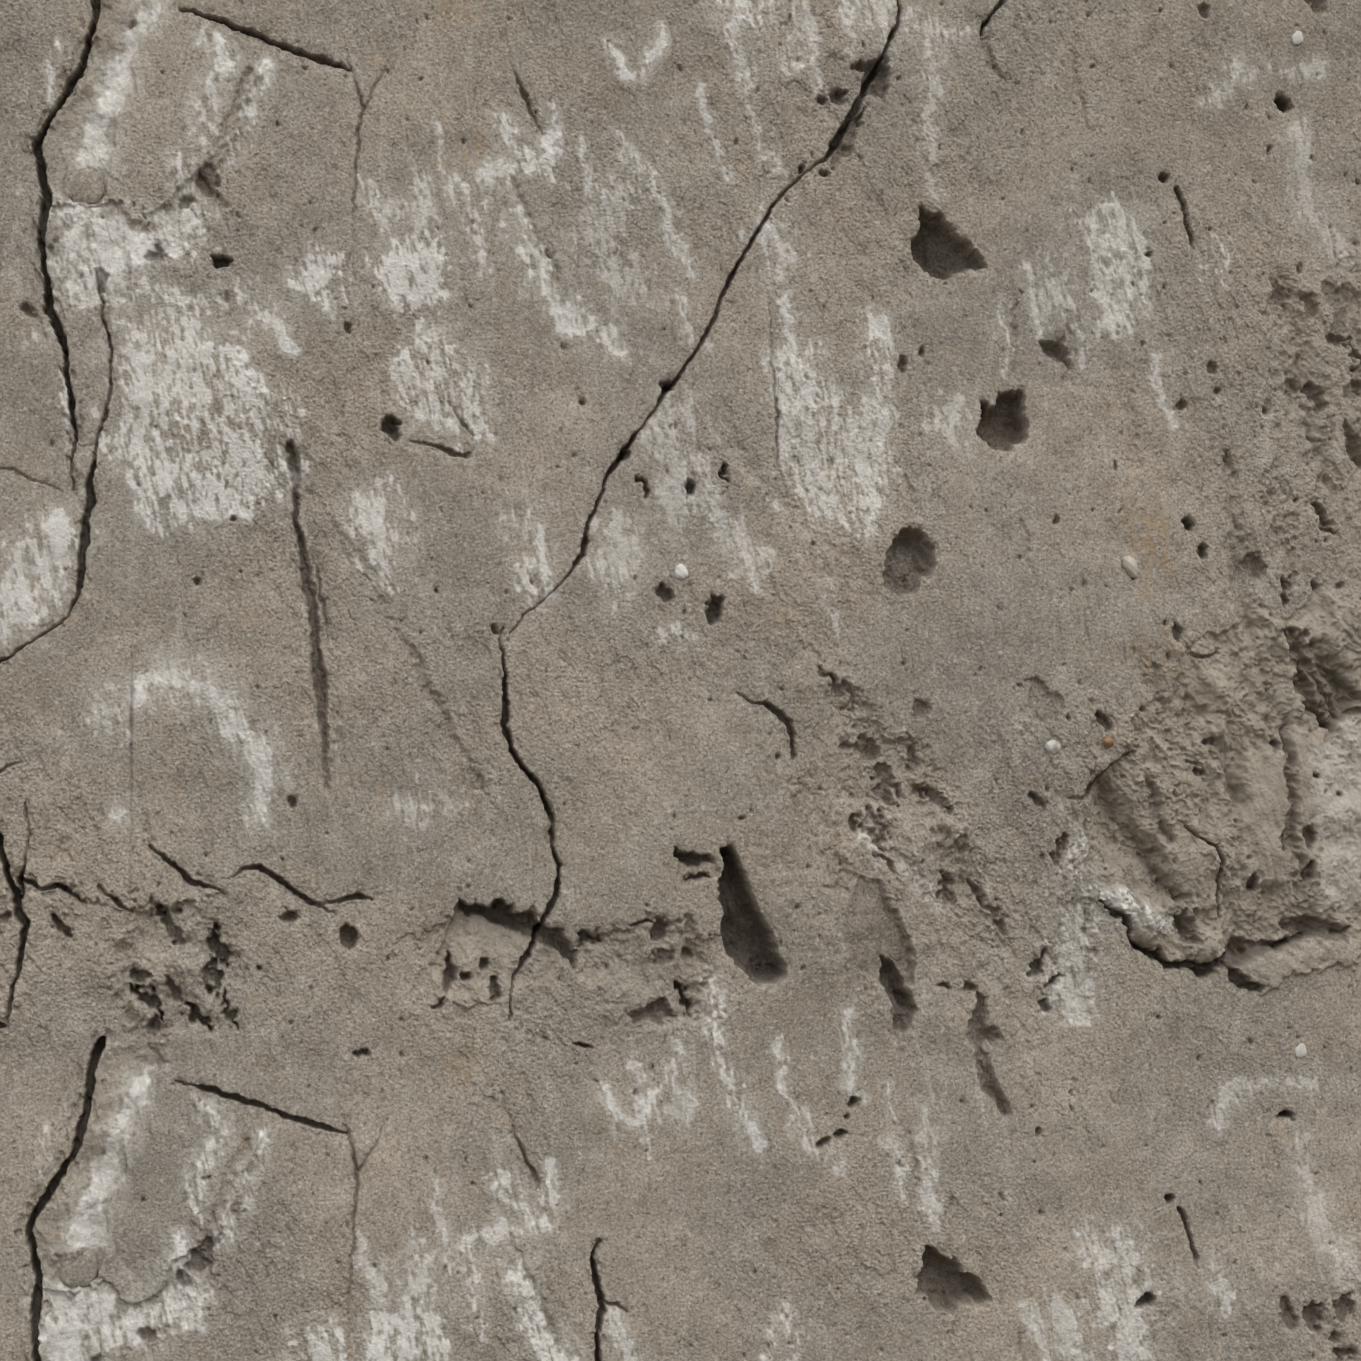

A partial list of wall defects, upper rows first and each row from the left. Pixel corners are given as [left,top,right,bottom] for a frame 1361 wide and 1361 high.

crack [979,0,1009,83]
crack [0,0,115,666]
crack [497,0,903,1023]
crack [0,760,23,776]
crack [0,802,137,1031]
crack [147,843,376,917]
crack [25,1036,107,1361]
crack [590,1238,630,1361]